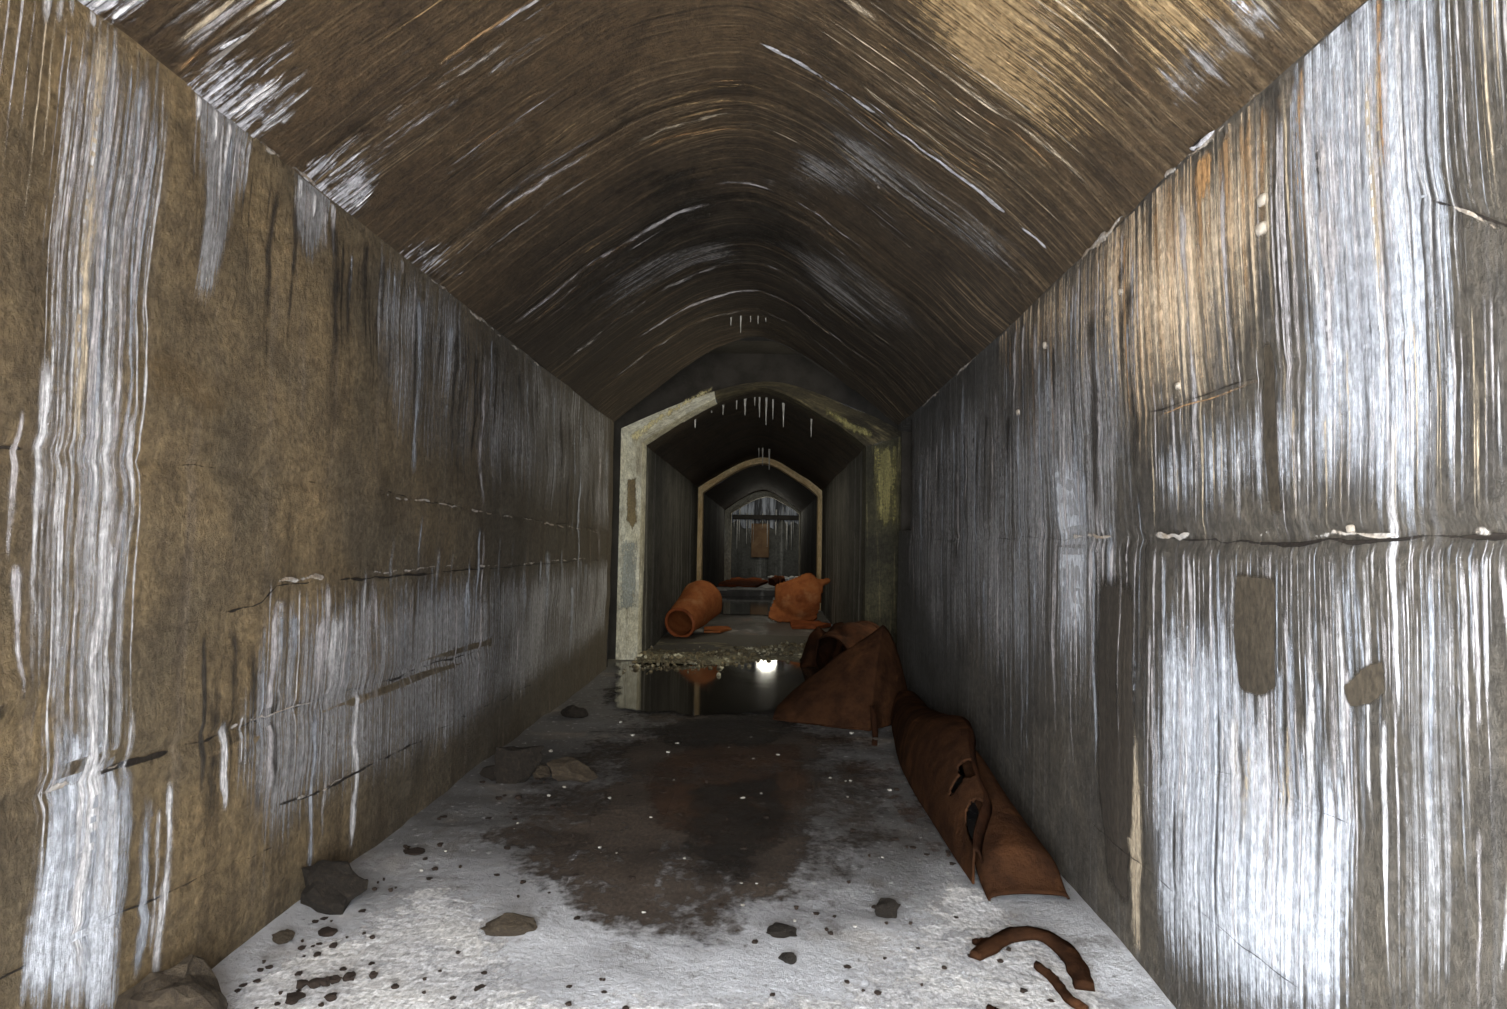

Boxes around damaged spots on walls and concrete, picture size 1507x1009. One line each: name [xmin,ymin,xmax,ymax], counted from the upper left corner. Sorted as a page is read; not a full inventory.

crack [0,443,20,451]
damp [2,0,172,1009]
damp [176,0,637,866]
crack [925,533,1111,542]
crack [1156,528,1507,547]
crack [46,653,471,793]
damp [483,709,895,941]